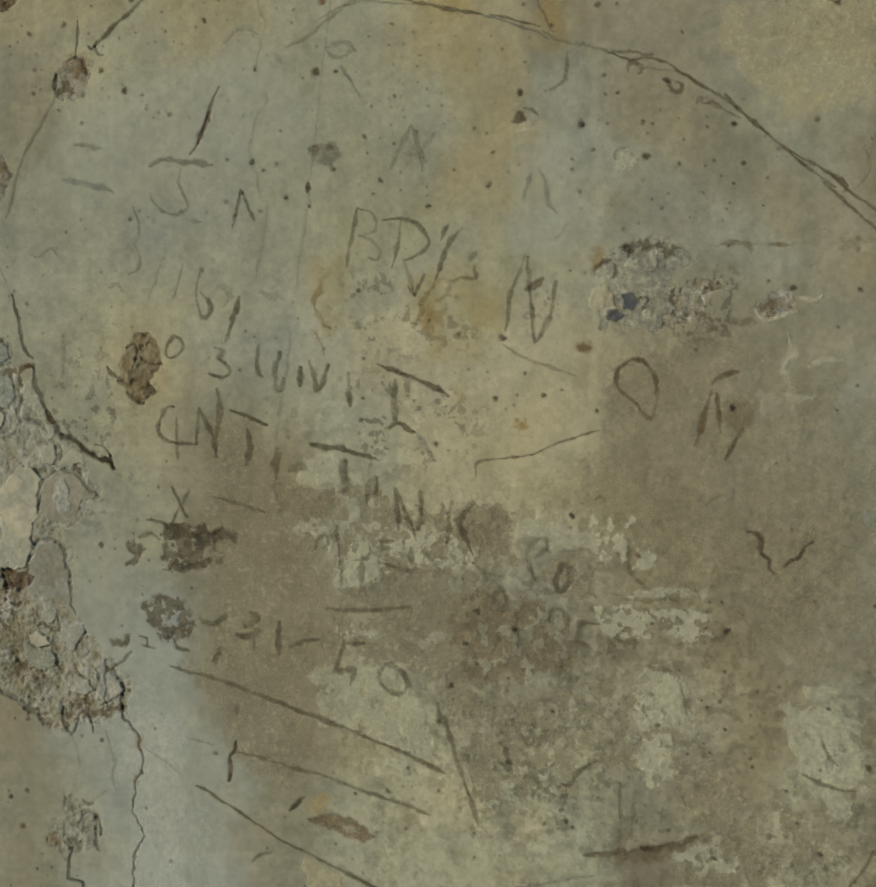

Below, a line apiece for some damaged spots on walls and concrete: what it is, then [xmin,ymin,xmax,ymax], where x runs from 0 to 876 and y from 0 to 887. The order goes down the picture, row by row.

spalling [0,0,17,12]
spalling [53,57,91,100]
spalling [0,156,14,202]
spalling [590,236,720,331]
crack [12,294,114,470]
spalling [107,332,163,405]
spalling [0,339,132,732]
spalling [126,534,144,565]
spalling [159,523,237,573]
spalling [111,635,150,648]
spalling [141,594,194,651]
crack [122,694,144,887]